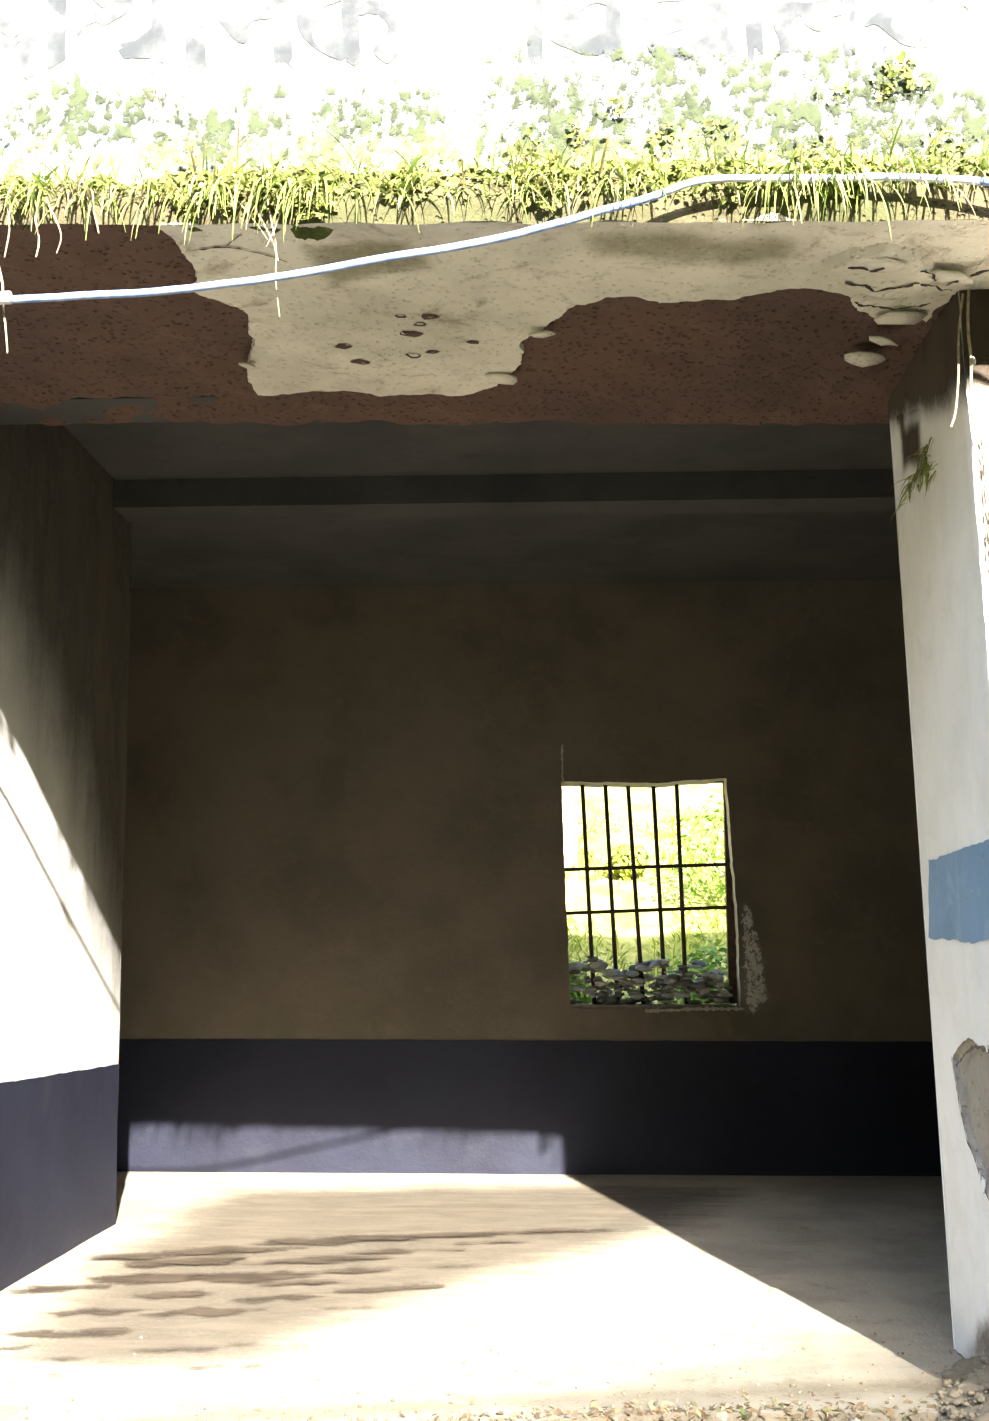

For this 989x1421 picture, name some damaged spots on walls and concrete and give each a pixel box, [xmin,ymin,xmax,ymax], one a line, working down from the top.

water stain [313,103,343,142]
water stain [865,41,921,100]
spalling [0,223,989,426]
peeling [972,381,989,610]
flaking render [951,1038,989,1199]